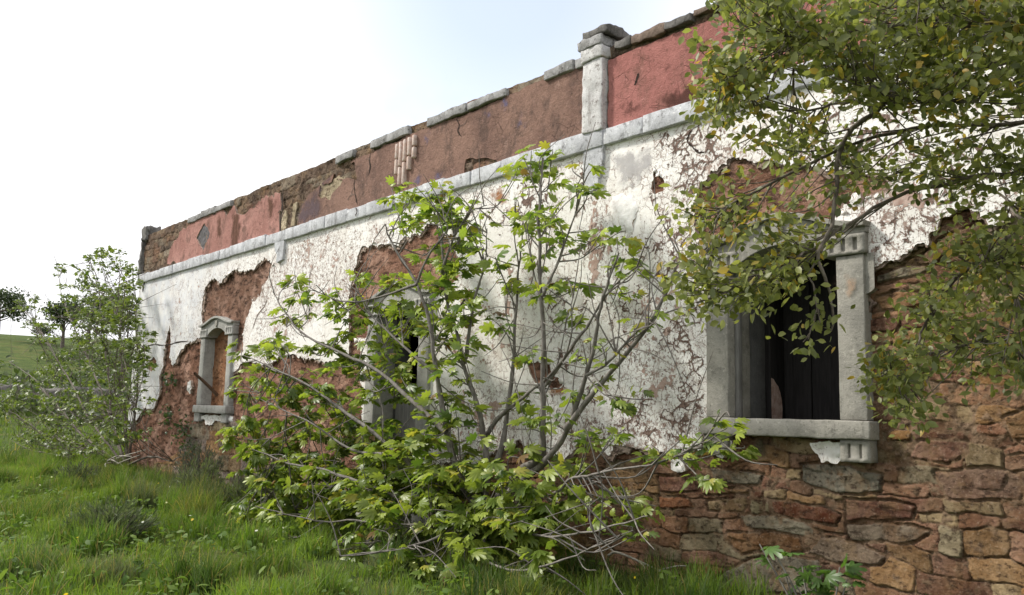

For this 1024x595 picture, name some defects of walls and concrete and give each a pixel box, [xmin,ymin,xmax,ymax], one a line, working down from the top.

spalling [697,157,835,197]
spalling [874,200,1019,273]
spalling [197,258,272,323]
spalling [292,217,434,354]
crack [491,116,734,445]
spalling [129,319,201,431]
peeling [642,368,676,399]
spalling [564,430,663,462]